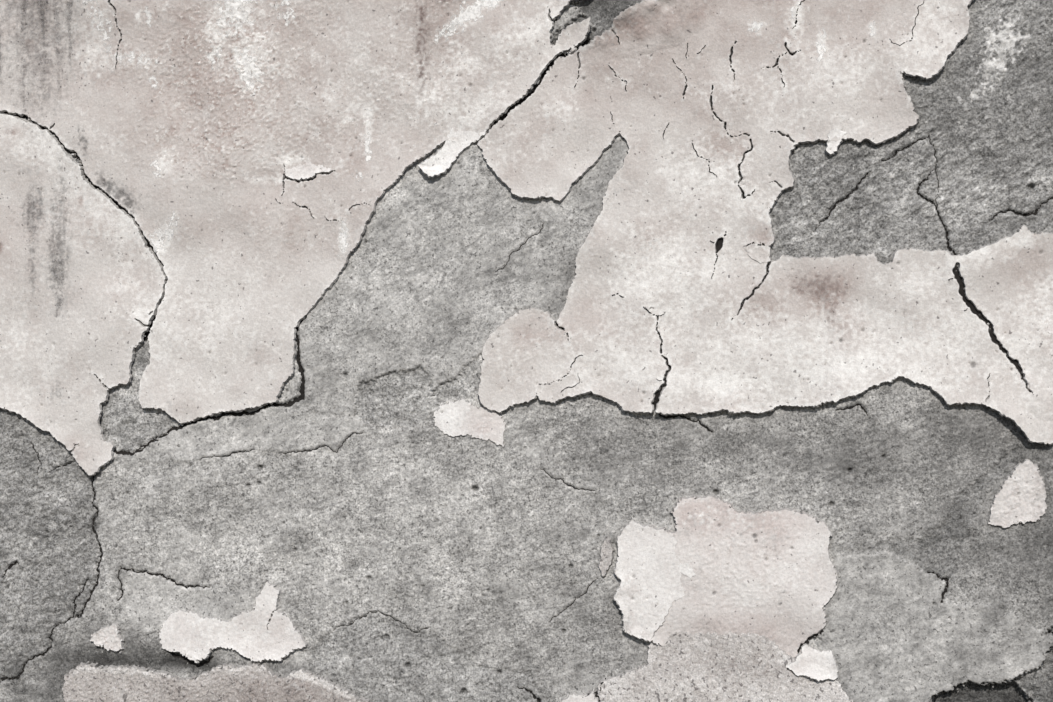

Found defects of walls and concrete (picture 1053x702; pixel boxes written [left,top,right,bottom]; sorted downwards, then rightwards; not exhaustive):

crack [2,112,164,267]
crack [136,300,162,341]
peeling [0,0,592,681]
crack [612,293,713,432]
peeling [353,0,1053,447]
crack [672,42,793,199]
crack [710,231,770,320]
crack [815,135,1034,395]
crack [991,197,1053,220]
spalling [878,449,1049,583]
peeling [61,494,854,702]
spalling [932,648,1053,702]